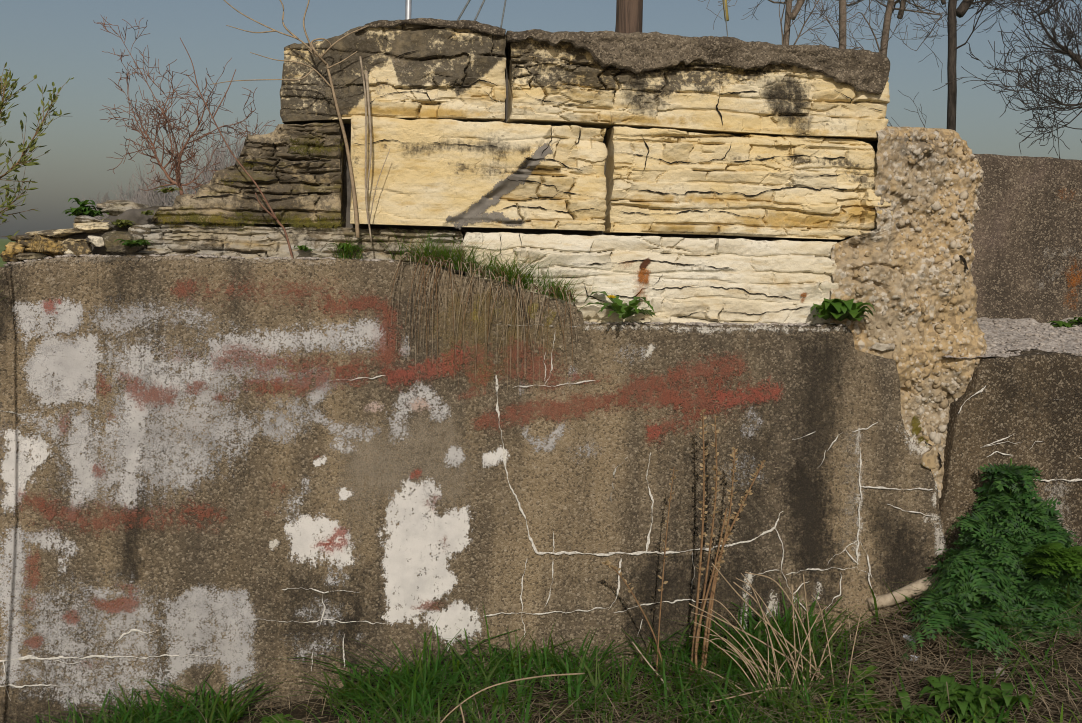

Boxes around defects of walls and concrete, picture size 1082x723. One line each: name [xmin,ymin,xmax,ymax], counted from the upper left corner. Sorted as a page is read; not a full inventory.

rust [638,258,651,297]
crack [573,259,809,340]
crack [483,324,942,637]
spalling [897,426,930,454]
spalling [923,473,945,555]
crack [984,436,1042,457]
crack [1033,458,1082,482]
crack [0,629,213,701]